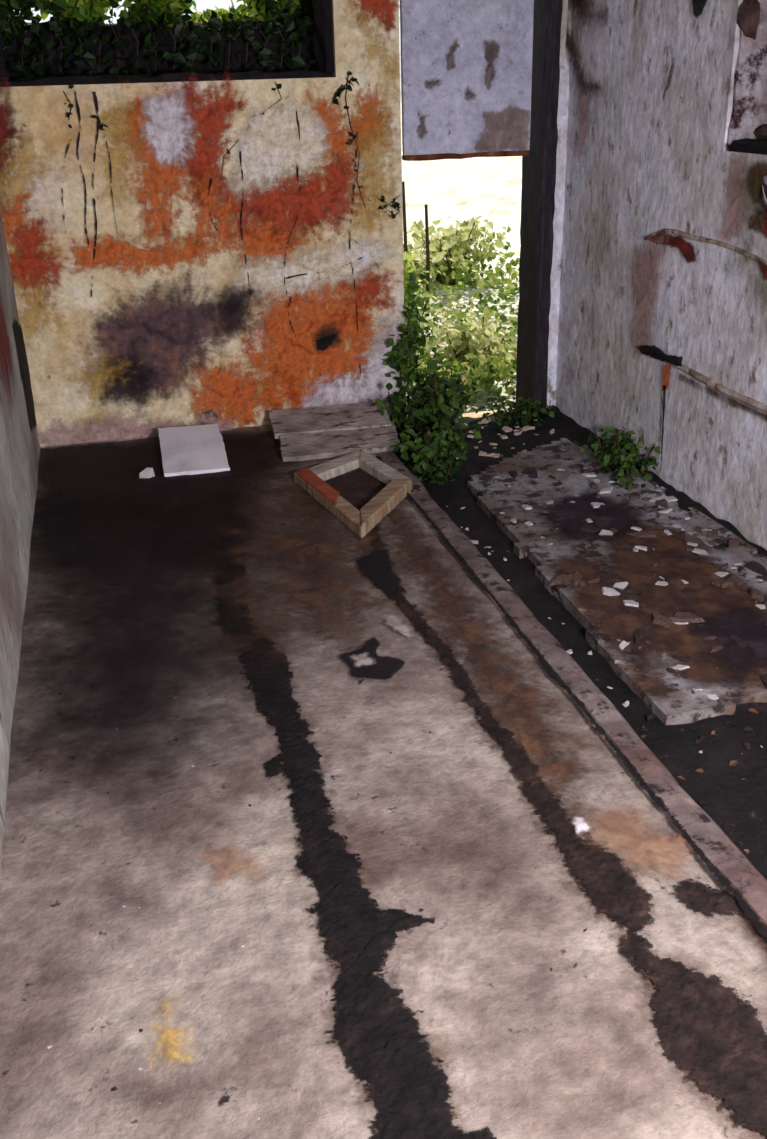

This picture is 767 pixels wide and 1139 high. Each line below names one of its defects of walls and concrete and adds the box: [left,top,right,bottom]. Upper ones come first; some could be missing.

spalling [737,0,760,40]
rust [0,78,396,338]
flaking render [720,124,767,241]
rust [0,297,14,403]
rust [189,263,395,429]
leakage [18,273,587,822]
leakage [598,810,683,876]